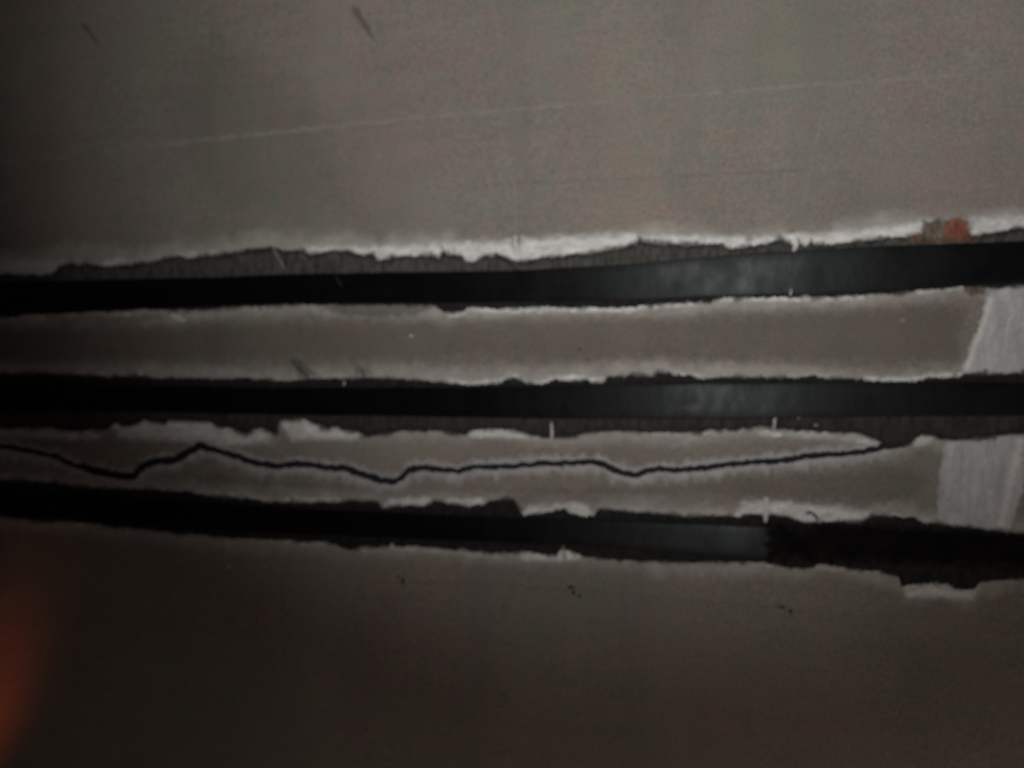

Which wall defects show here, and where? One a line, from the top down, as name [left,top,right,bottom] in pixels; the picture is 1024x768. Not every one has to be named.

spalling [299,218,941,263]
corrosion [909,218,971,245]
spalling [966,215,1024,236]
spalling [447,301,703,317]
spalling [445,374,605,386]
spalling [0,418,364,446]
spalling [651,425,881,447]
crack [0,439,906,491]
spalling [522,502,594,517]
spalling [609,496,870,523]
spalling [358,543,582,561]
spalling [903,581,982,600]